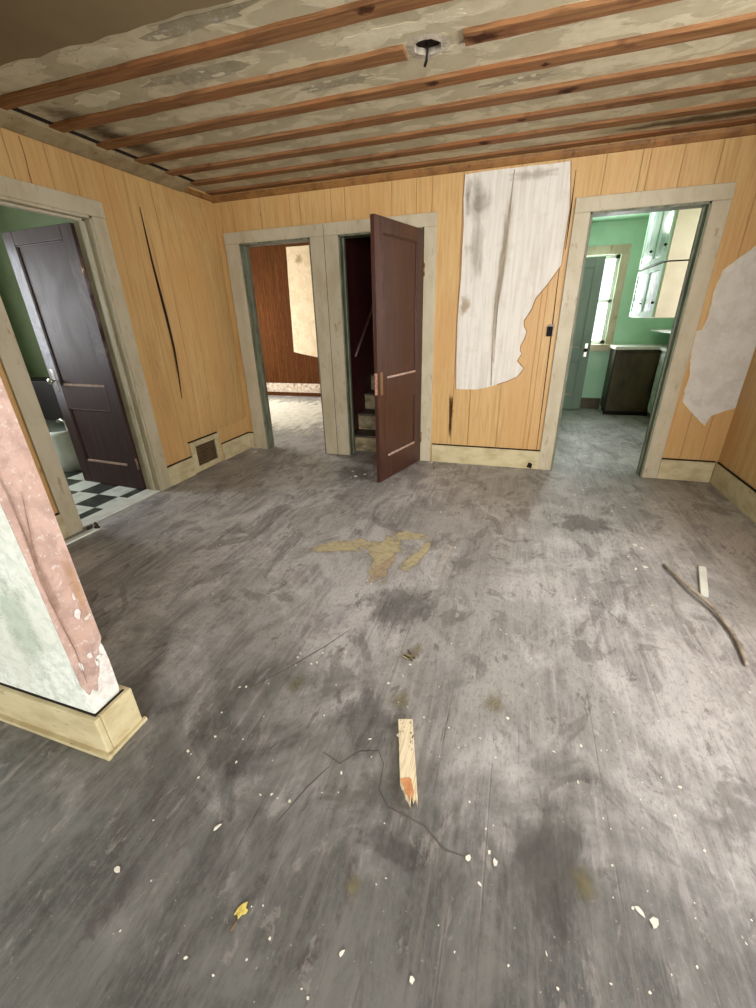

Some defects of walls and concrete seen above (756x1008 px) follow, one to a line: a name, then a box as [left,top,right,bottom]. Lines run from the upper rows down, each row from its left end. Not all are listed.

crack [139,207,182,398]
peeling [456,161,572,390]
peeling [683,246,756,426]
peeling [79,643,119,712]
crack [277,750,466,857]